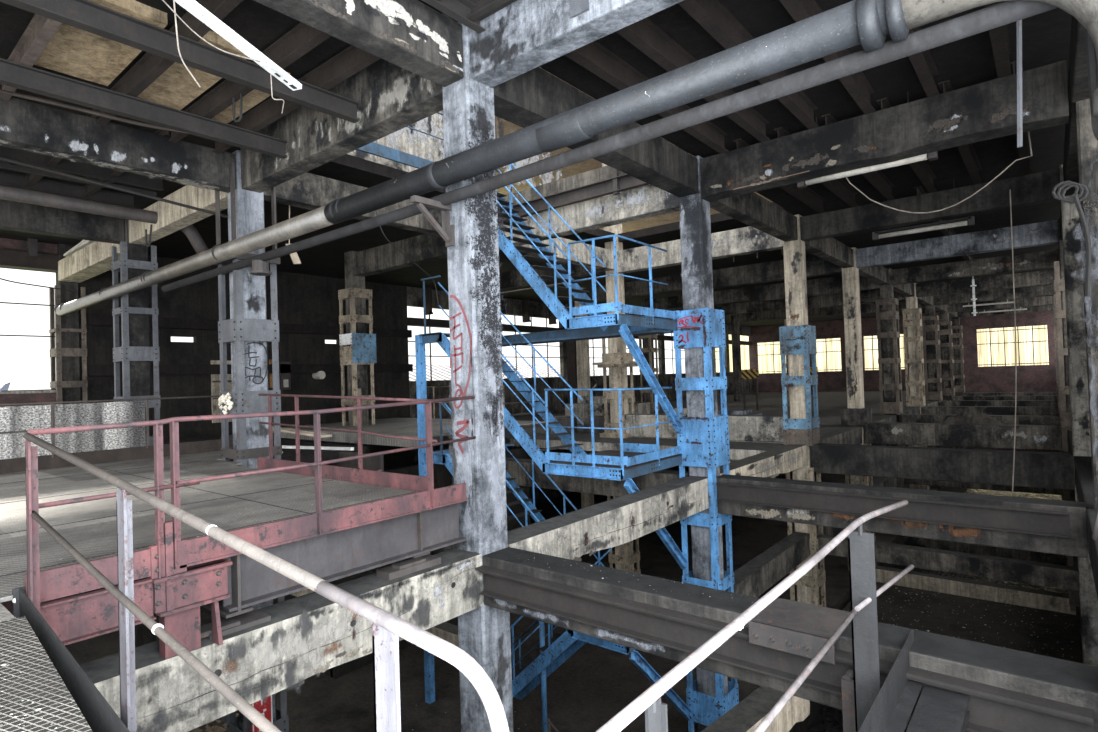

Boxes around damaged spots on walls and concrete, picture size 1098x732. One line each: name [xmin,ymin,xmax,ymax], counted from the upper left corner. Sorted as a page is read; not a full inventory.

peeling [309,0,463,75]
spalling [927,114,969,132]
spalling [710,145,840,190]
leakage [356,560,483,627]
leakage [136,609,362,732]